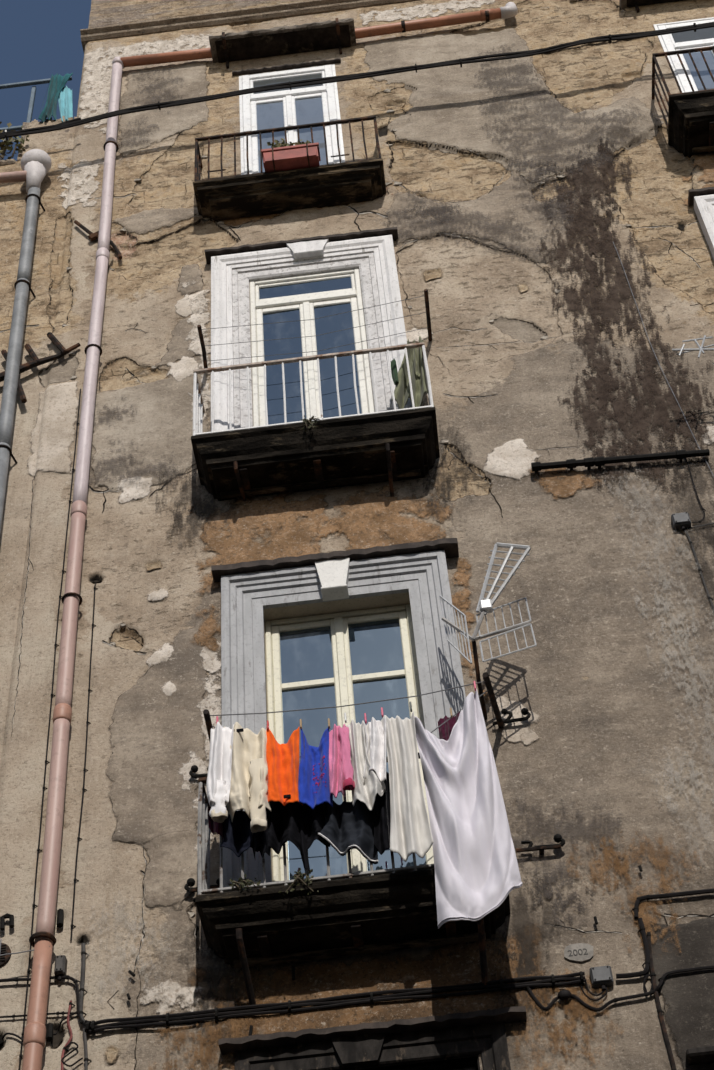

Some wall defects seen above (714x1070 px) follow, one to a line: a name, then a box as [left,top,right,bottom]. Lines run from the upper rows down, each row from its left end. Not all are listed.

crack [394,142,510,203]
spalling [46,157,104,332]
crack [340,205,388,231]
crack [399,233,505,249]
spalling [99,357,168,392]
peeling [180,281,211,420]
spalling [109,622,144,651]
peeling [178,628,222,809]
spalling [186,894,208,952]
crack [653,912,714,925]
peeling [139,966,215,1015]